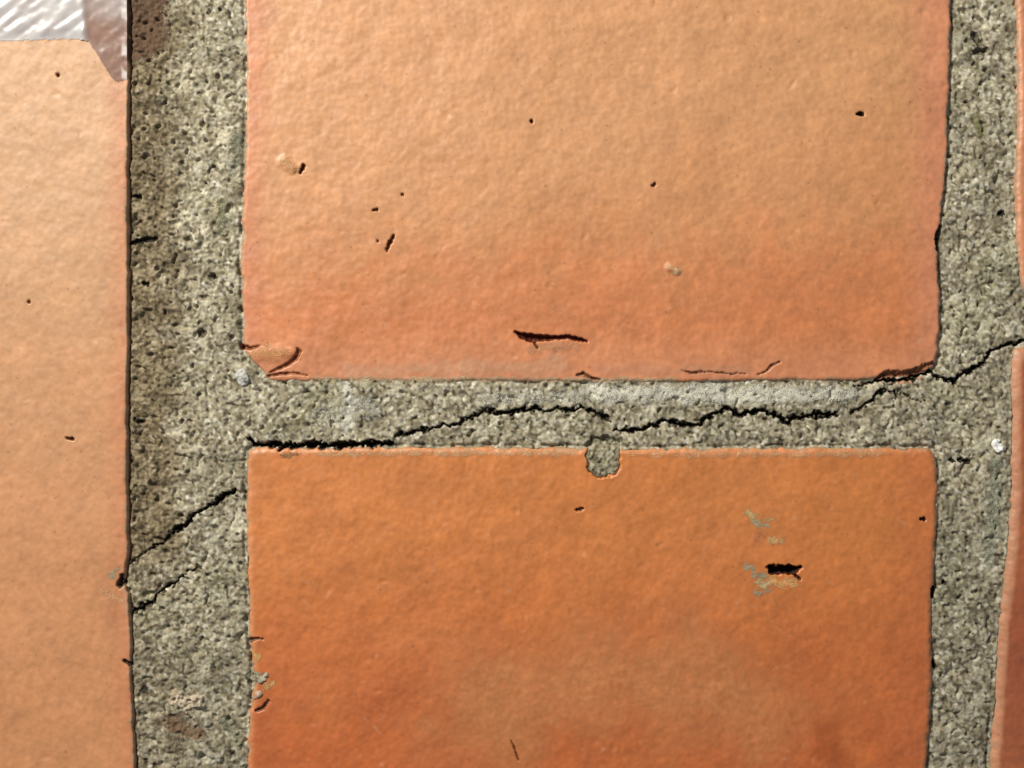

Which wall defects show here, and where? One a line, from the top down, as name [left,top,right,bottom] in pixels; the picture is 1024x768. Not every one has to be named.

spalling [240,341,308,378]
crack [246,339,1024,452]
crack [130,488,237,564]
spalling [743,508,785,546]
crack [132,564,210,614]
spalling [742,563,802,596]